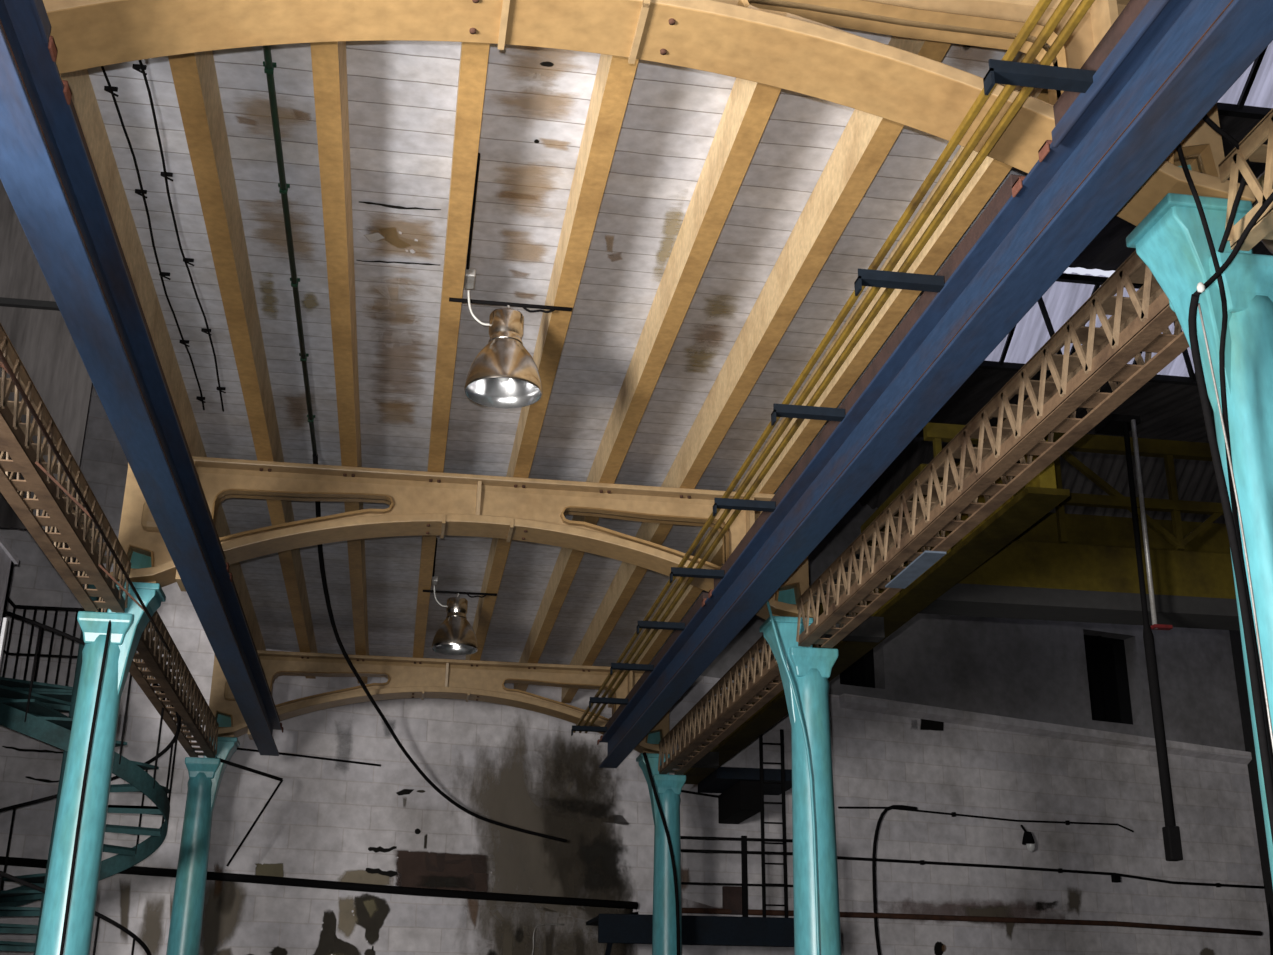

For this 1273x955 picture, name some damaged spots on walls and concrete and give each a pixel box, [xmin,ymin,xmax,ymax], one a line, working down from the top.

leakage [534,139,565,149]
leakage [507,169,548,204]
leakage [375,221,427,257]
leakage [505,231,541,260]
leakage [470,729,635,955]
flaking render [313,829,492,955]